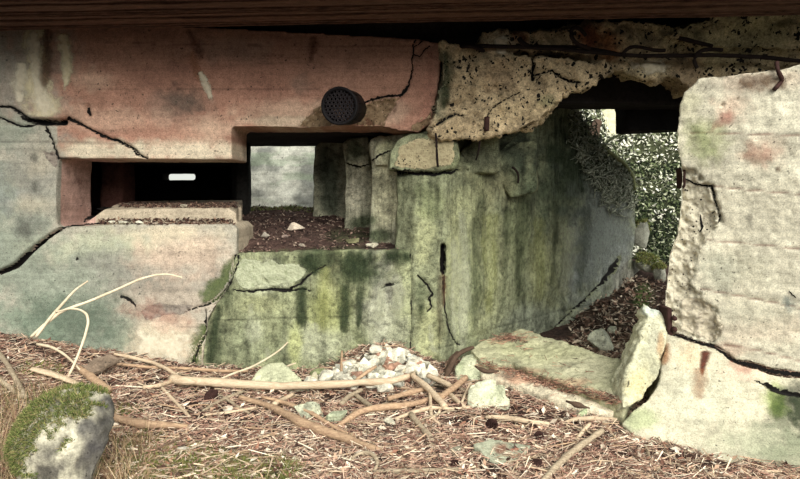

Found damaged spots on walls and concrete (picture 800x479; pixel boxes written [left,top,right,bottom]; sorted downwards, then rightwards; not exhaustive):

leakage [11,29,59,120]
leakage [58,34,72,86]
spalling [459,26,800,91]
crack [0,105,148,160]
crack [685,179,721,232]
crack [0,207,112,275]
crack [188,254,326,364]
leakage [297,288,306,326]
leakage [305,255,317,275]
leakage [340,286,363,332]
crack [381,245,460,348]
crack [672,334,800,398]